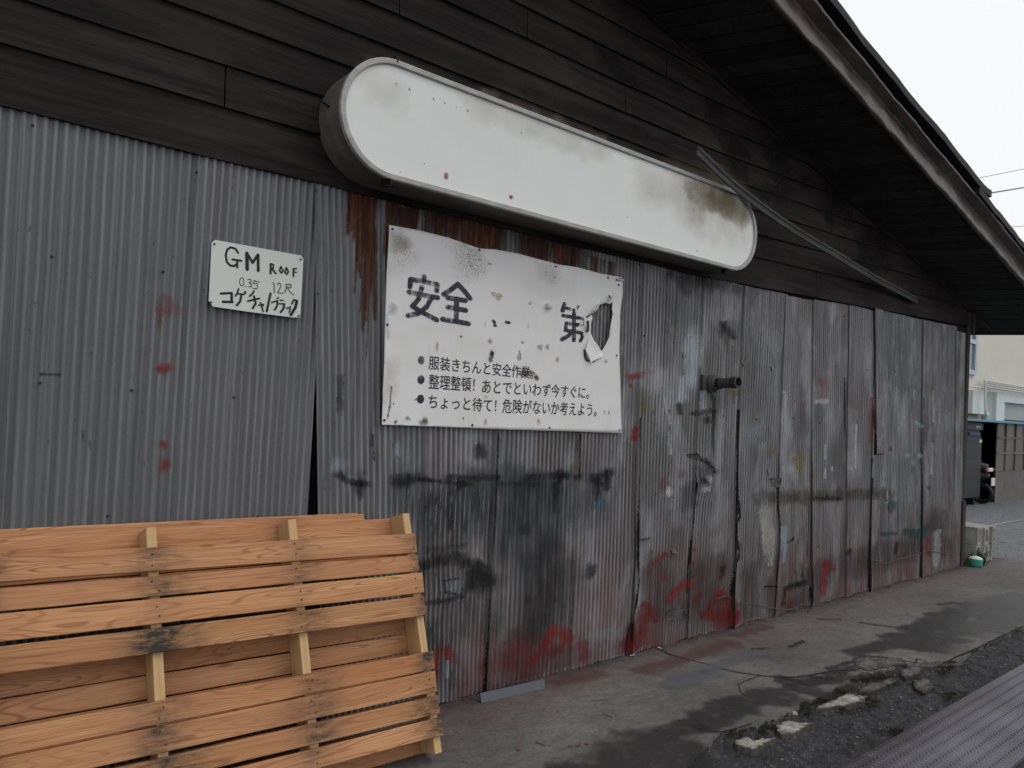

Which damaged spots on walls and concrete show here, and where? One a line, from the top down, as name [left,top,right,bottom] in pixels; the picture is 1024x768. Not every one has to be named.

corrosion [347,191,503,356]
corrosion [521,233,616,276]